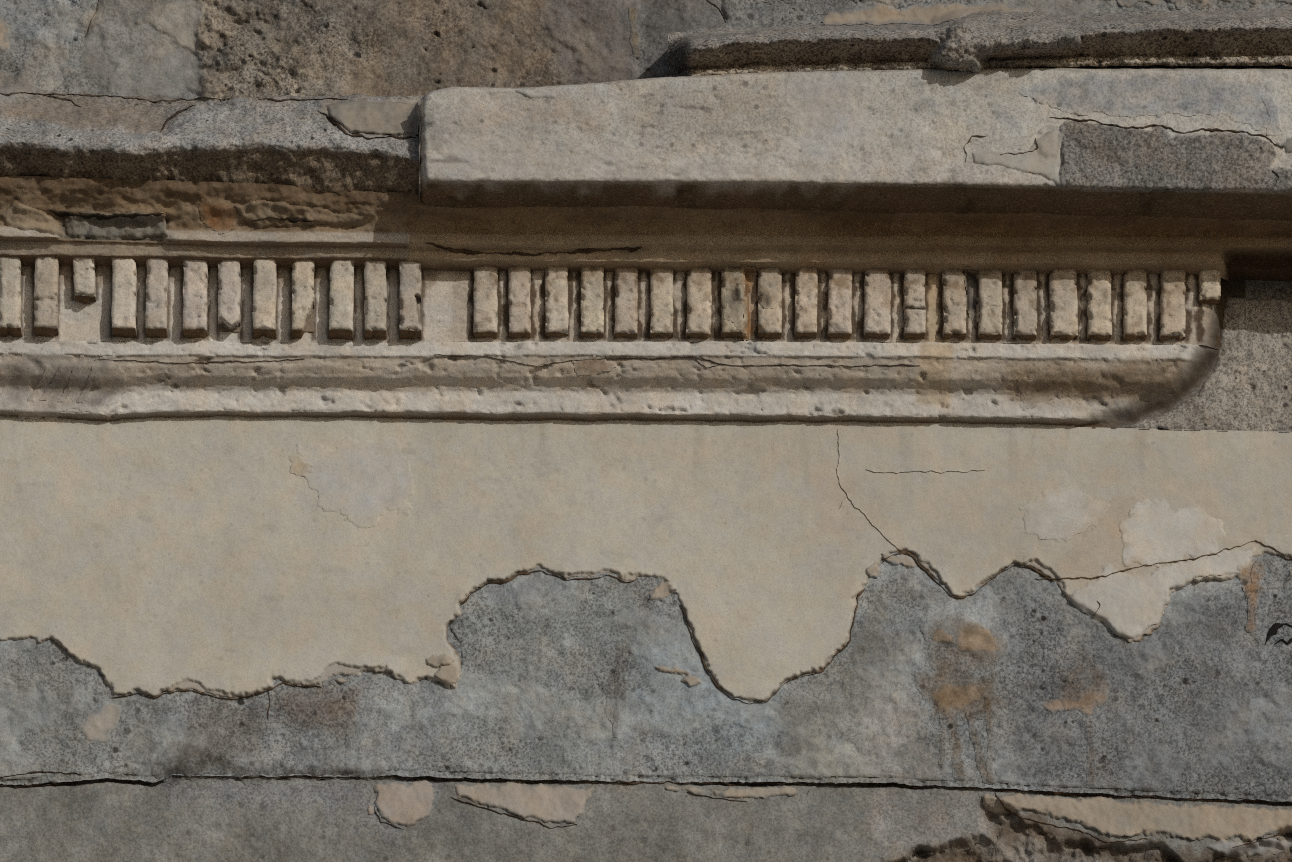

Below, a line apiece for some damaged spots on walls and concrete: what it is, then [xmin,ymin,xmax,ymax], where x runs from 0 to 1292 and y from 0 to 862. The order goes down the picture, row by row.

crack [0,92,417,139]
flaking render [515,89,556,99]
crack [964,117,1282,188]
crack [680,432,1292,704]
spalling [0,496,1292,862]
crack [0,771,1292,843]